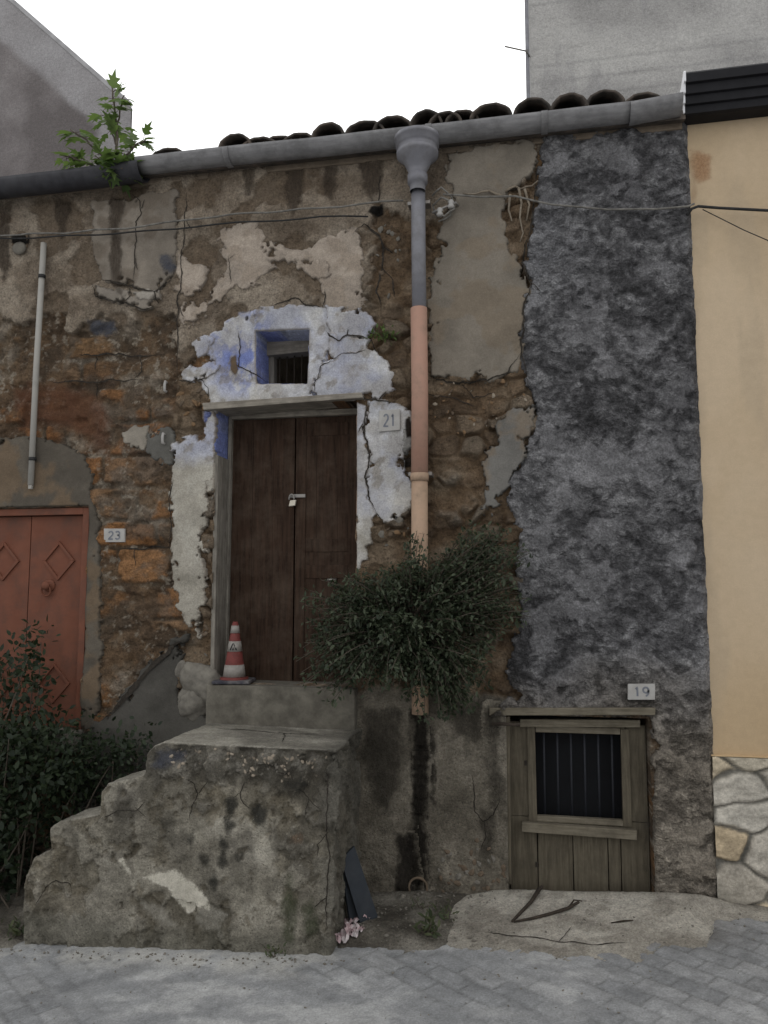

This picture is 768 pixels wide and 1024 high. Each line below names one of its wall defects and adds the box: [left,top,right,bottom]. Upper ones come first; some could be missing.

peeling [426,138,543,436]
crack [237,333,262,379]
peeling [90,188,411,639]
crack [314,330,377,391]
crack [358,392,391,519]
crack [186,779,208,819]
leakage [367,709,437,891]
spalling [143,870,228,929]